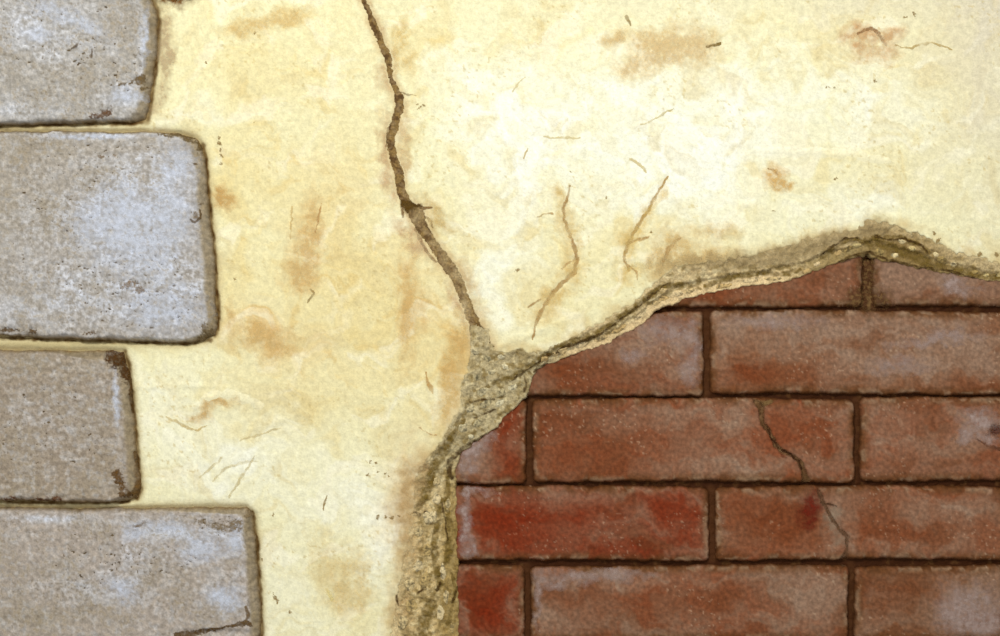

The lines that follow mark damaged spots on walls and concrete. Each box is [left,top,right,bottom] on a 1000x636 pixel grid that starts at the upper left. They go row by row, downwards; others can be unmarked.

crack [361,0,495,352]
crack [528,185,579,340]
crack [624,176,668,273]
flaking render [376,219,1000,636]
crack [754,399,848,566]